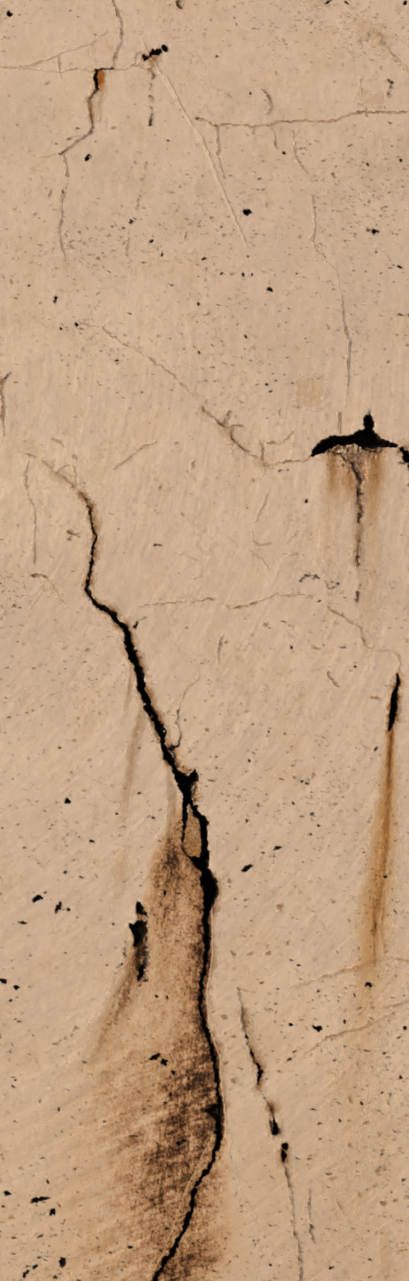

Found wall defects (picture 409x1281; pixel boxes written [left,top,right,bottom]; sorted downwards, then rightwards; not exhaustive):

crack [0,372,11,432]
crack [0,0,168,268]
crack [174,0,184,9]
crack [196,29,409,432]
rust [8,793,264,1281]
crack [22,318,409,1281]
rust [326,724,400,1213]